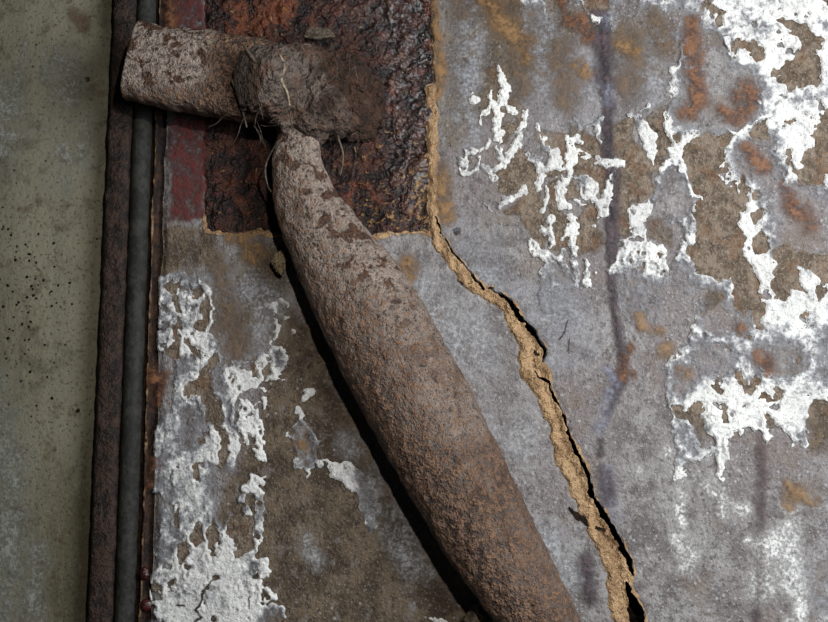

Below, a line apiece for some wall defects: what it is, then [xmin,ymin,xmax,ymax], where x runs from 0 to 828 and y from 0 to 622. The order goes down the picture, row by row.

rust [678,15,708,120]
rust [718,81,761,126]
peeling [457,0,828,482]
rust [742,142,772,172]
rust [781,182,816,230]
crack [425,84,648,622]
peeling [150,272,290,622]